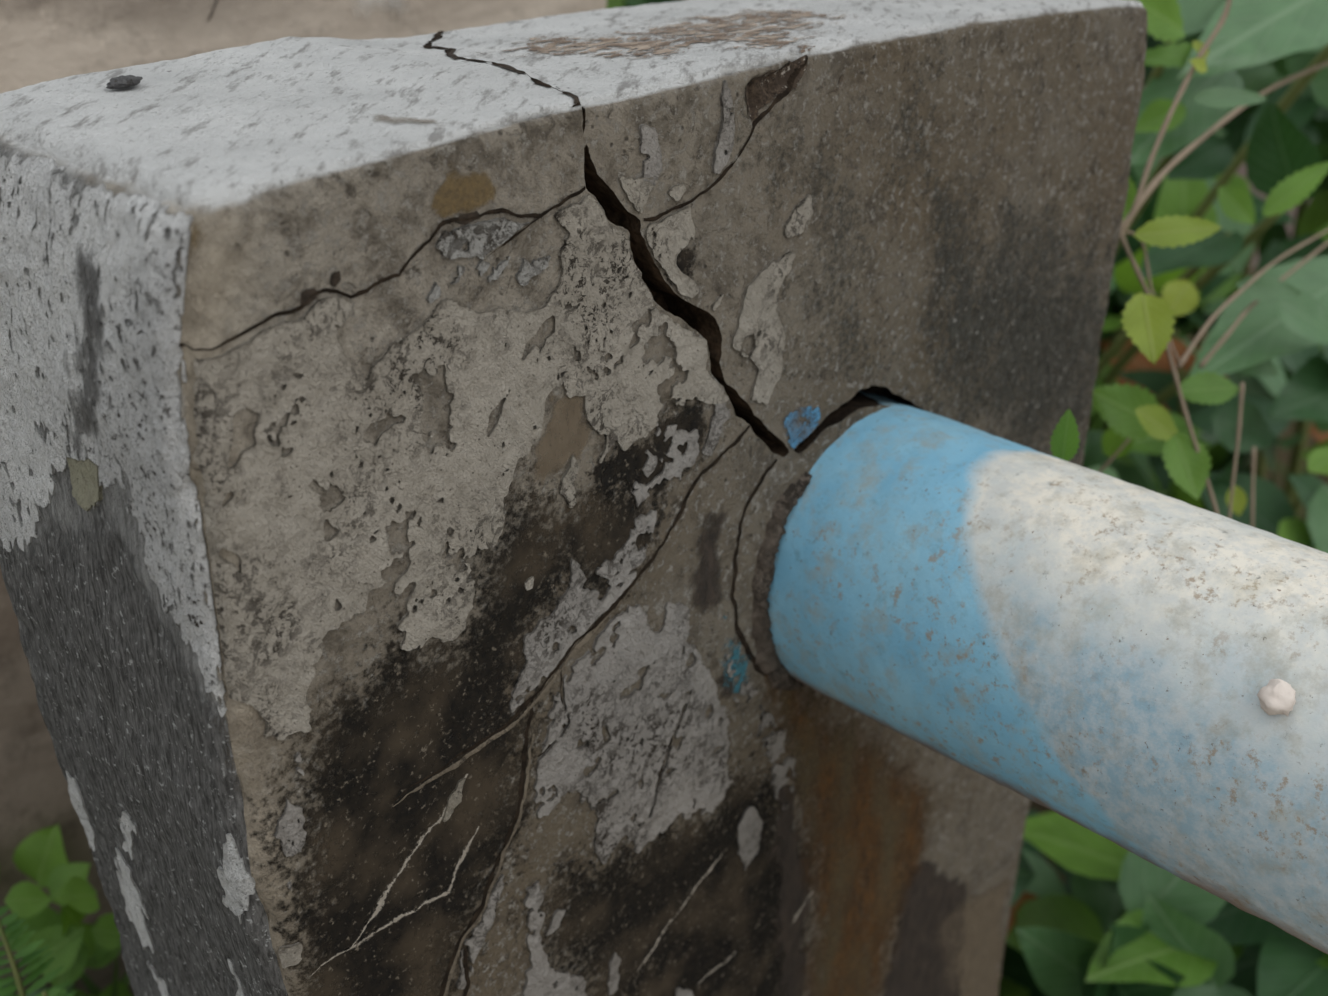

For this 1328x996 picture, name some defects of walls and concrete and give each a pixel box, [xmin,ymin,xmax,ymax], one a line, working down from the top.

damp [0,392,709,996]
peeling [0,124,796,870]
crack [100,31,923,996]
damp [507,746,817,996]
damp [693,513,724,611]
peeling [730,194,814,405]